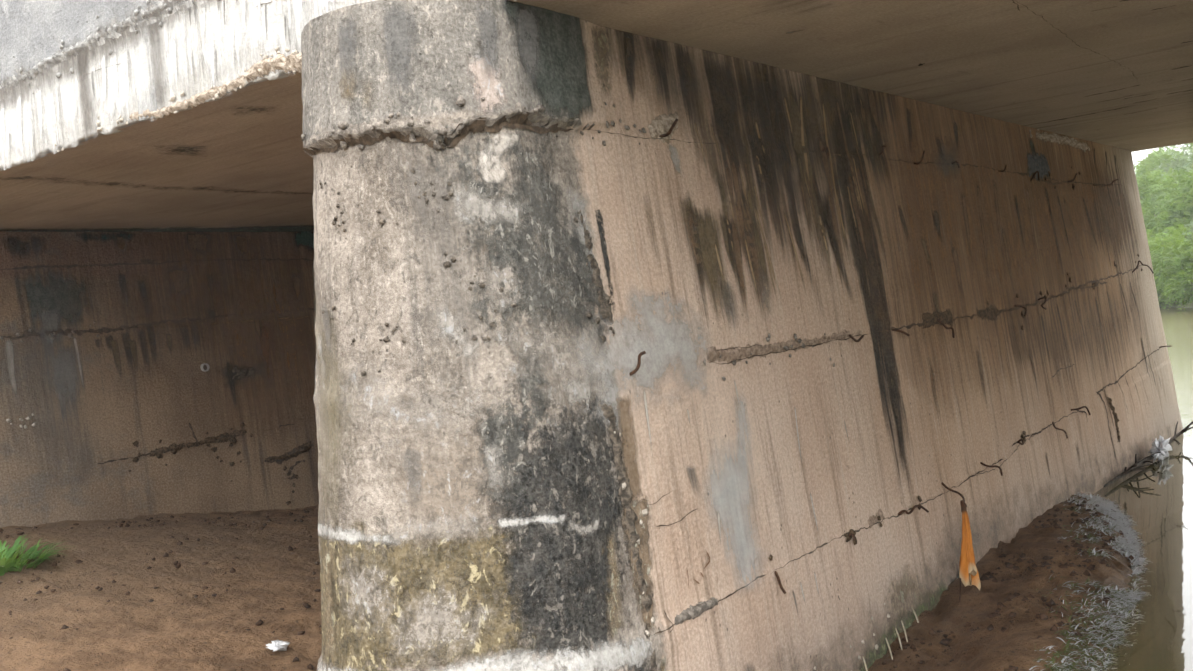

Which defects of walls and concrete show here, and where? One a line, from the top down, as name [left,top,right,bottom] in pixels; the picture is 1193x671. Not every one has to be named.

spalling [0,0,182,103]
spalling [116,46,302,125]
damp [385,9,415,86]
crack [1012,0,1193,126]
damp [478,0,906,470]
crack [872,254,1143,333]
damp [498,515,613,619]
damp [549,445,589,500]
crack [636,491,698,527]
crack [654,409,1080,635]